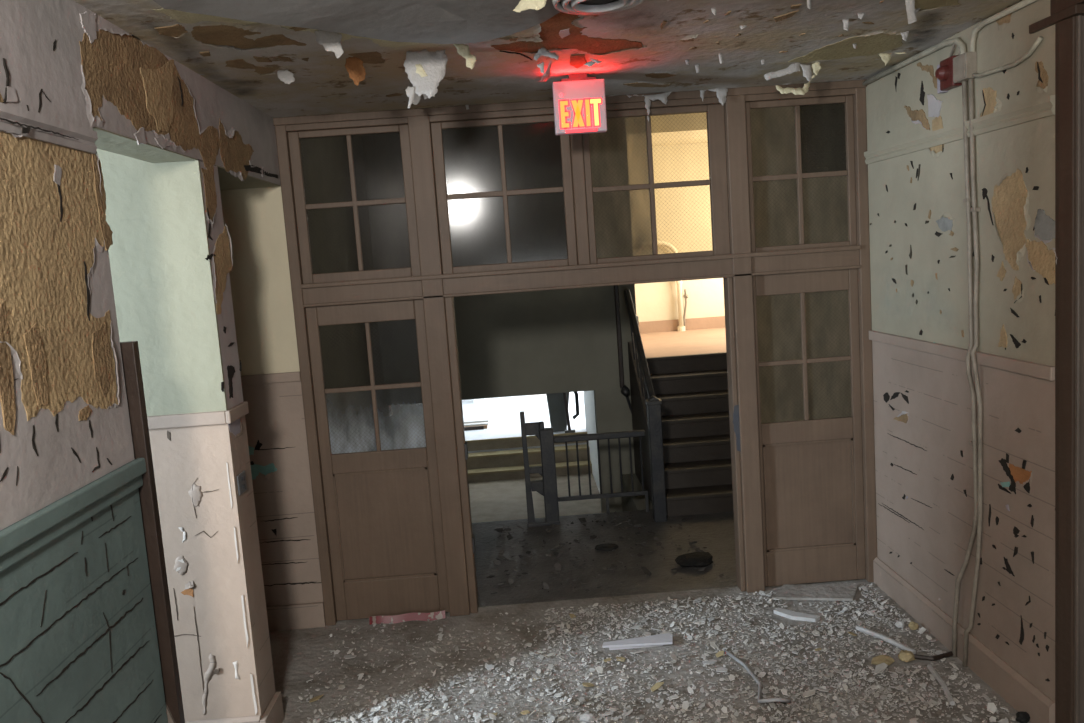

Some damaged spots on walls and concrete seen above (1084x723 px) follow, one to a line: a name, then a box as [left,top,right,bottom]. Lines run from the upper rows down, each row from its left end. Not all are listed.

flaking render [155,22,391,86]
peeling [386,44,476,108]
flaking render [491,0,647,82]
flaking render [904,62,956,131]
flaking render [79,12,278,347]
flaking render [0,130,119,435]
flaking render [982,167,1057,317]
crack [0,405,112,486]
spalling [221,360,242,398]
spalling [883,390,909,423]
spalling [988,453,1034,586]
crack [0,505,204,723]